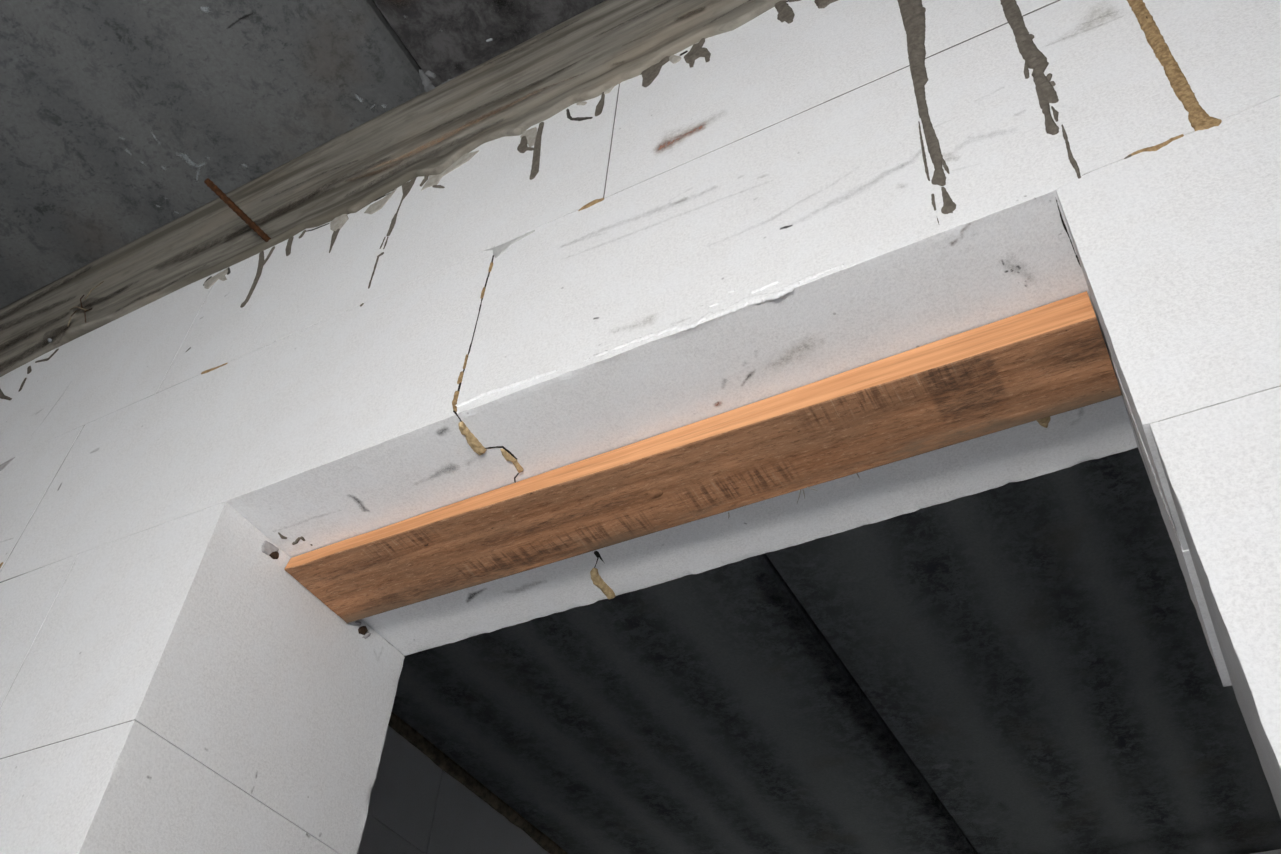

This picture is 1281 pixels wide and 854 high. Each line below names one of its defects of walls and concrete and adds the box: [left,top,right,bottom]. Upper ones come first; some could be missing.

leakage [86,119,503,311]
leakage [918,121,950,223]
leakage [1061,124,1081,179]
leakage [0,267,91,372]
crack [452,255,524,483]
crack [590,551,616,599]